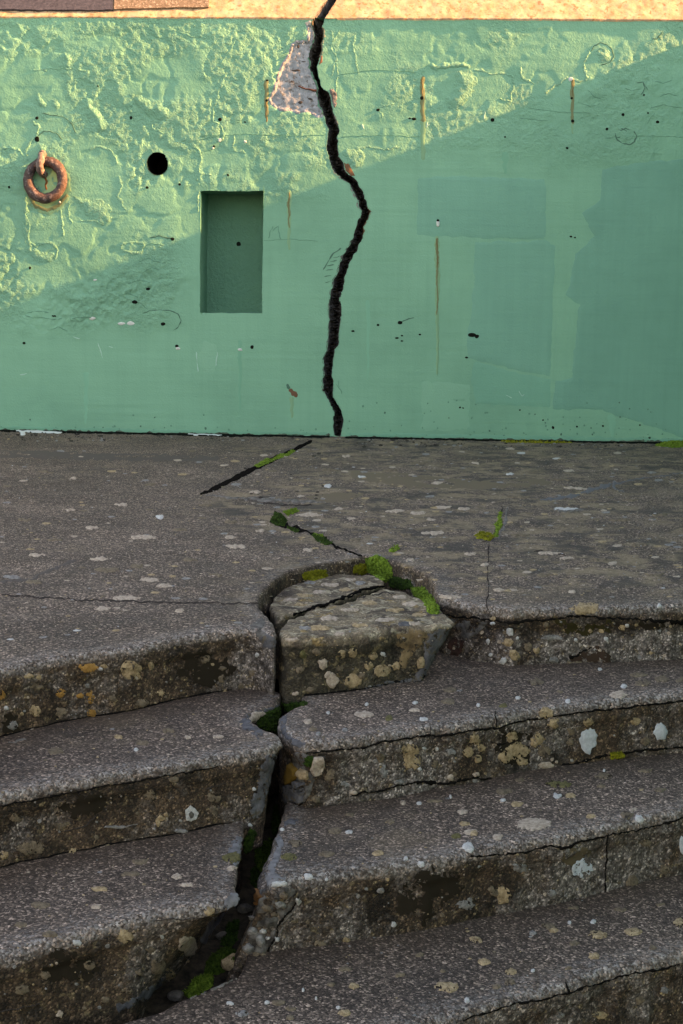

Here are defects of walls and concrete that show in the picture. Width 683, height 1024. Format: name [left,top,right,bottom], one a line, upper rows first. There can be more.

spalling [265,20,338,127]
corrosion [23,167,71,216]
crack [196,0,419,495]
crack [261,502,362,557]
crack [293,585,396,616]
crack [155,915,205,923]
crack [267,896,300,952]
crack [190,978,237,999]